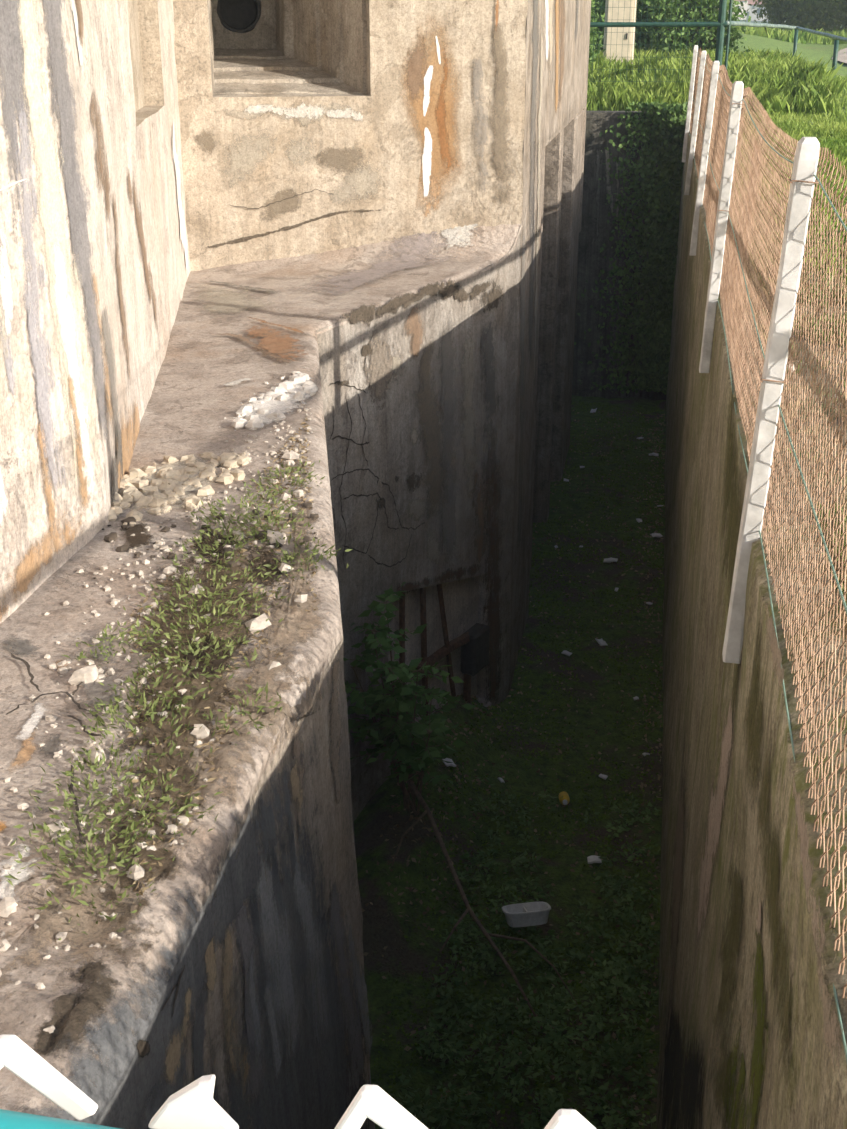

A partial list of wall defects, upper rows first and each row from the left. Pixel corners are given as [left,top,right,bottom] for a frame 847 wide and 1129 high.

corrosion [406,31,458,216]
water stain [0,0,140,505]
water stain [127,173,158,332]
spalling [340,279,505,409]
corrosion [0,378,89,621]
crack [329,335,424,567]
water stain [40,736,60,757]
crack [6,653,106,736]
crack [68,765,82,843]
water stain [84,637,120,714]
water stain [697,700,733,946]
water stain [24,754,373,1129]